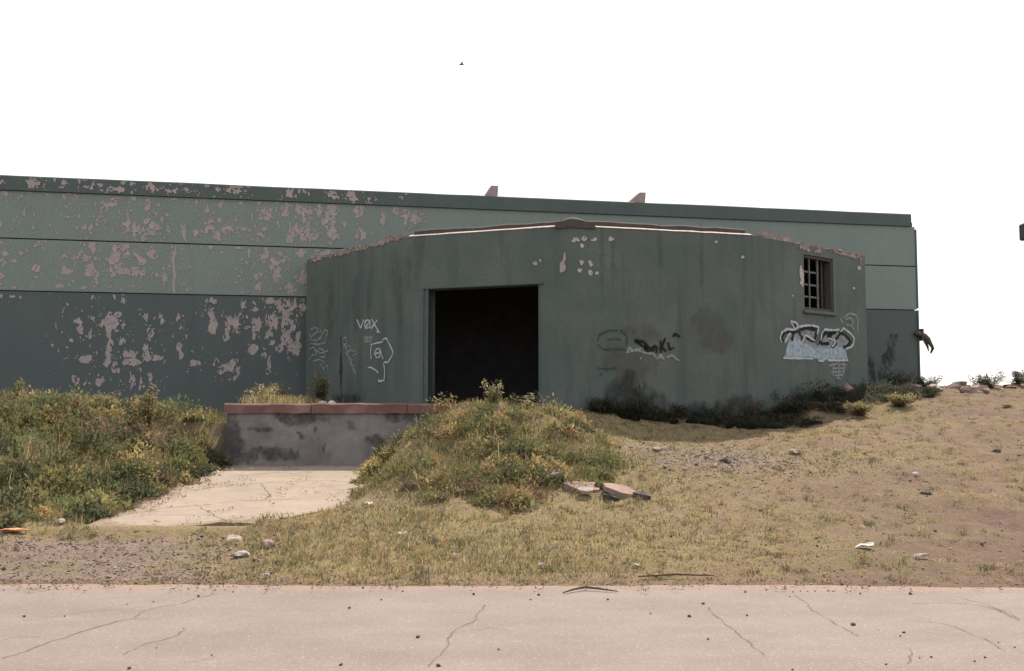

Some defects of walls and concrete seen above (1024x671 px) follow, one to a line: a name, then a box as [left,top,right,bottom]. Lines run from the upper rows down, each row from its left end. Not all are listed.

peeling [559,236,614,275]
spalling [753,229,864,270]
peeling [0,177,428,391]
damp [258,413,316,437]